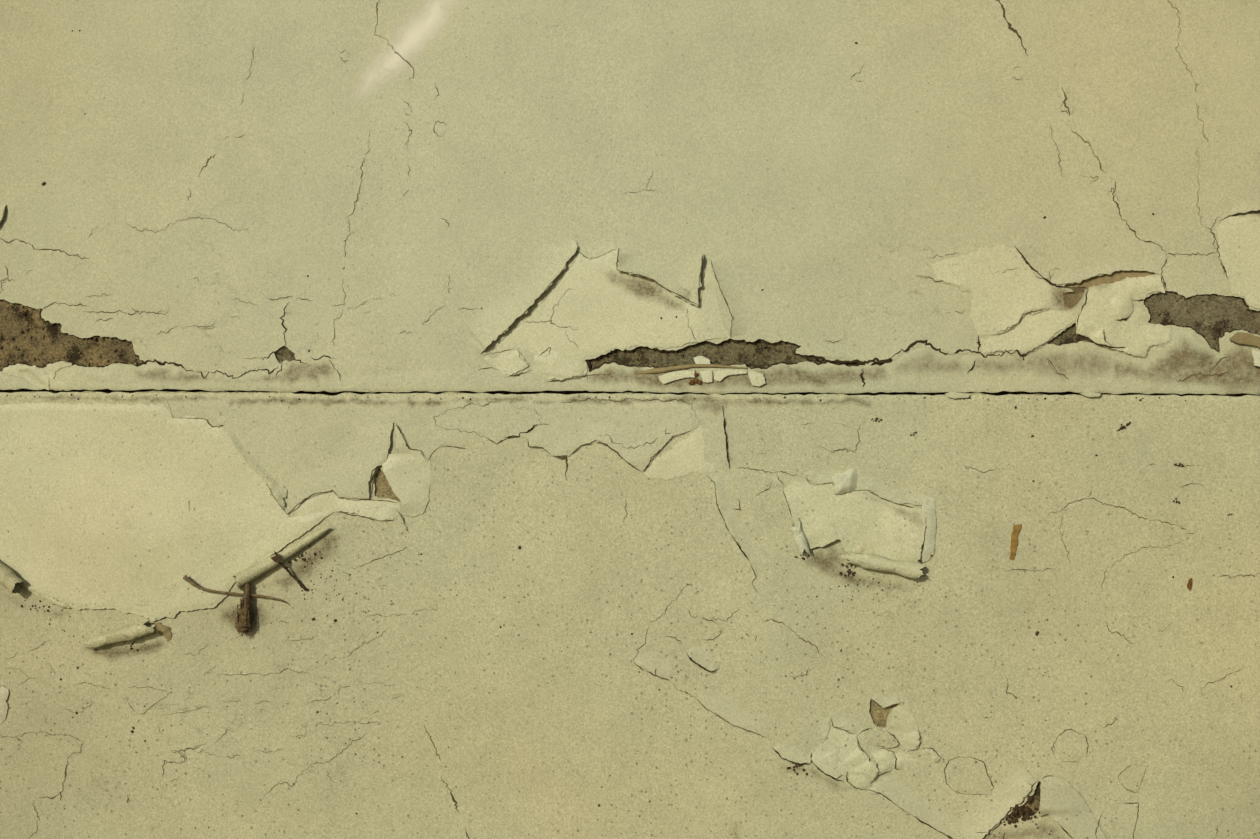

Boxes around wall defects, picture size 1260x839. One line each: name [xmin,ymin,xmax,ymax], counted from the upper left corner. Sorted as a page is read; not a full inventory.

crack [998,0,1027,54]
crack [0,135,247,288]
crack [42,132,396,379]
peeling [465,236,893,386]
peeling [931,235,1163,354]
crack [1050,1,1227,288]
spalling [1144,195,1260,353]
peeling [0,299,763,649]
crack [555,455,568,477]
crack [433,397,700,449]
peeling [760,468,937,580]
peeling [635,652,1107,839]